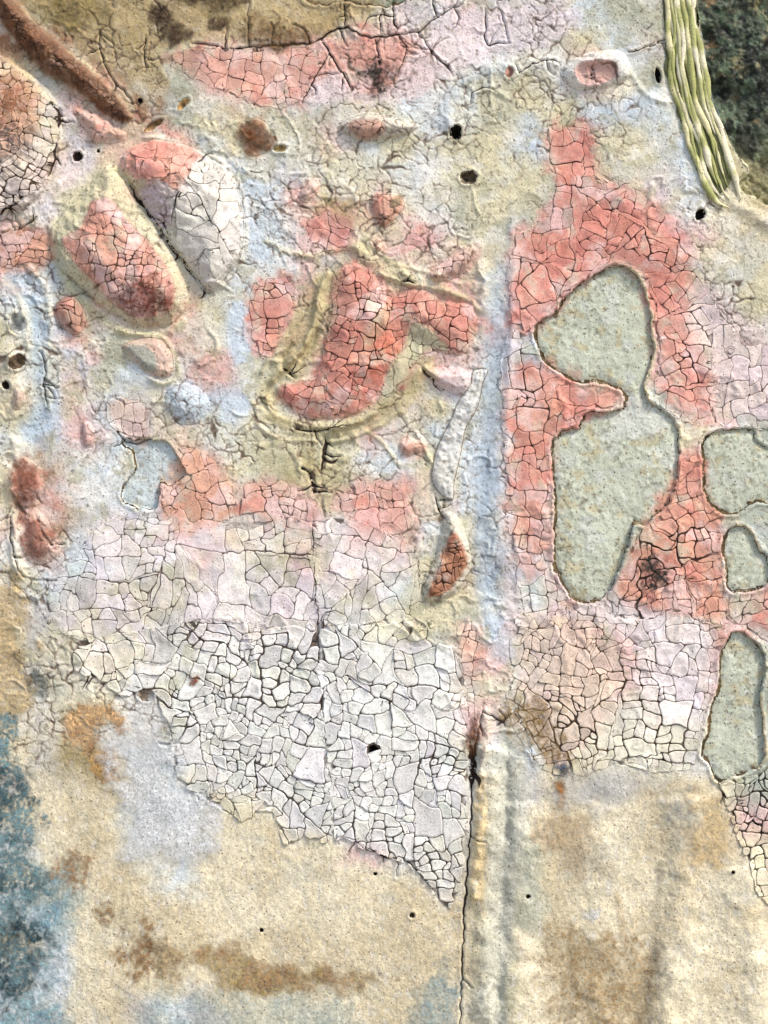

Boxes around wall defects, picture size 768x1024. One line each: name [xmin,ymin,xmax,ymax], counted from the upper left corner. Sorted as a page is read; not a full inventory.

corrosion [241,119,277,153]
crack [138,0,559,110]
crack [277,266,477,471]
peeling [533,265,680,603]
crack [482,121,768,781]
peeling [701,428,768,593]
leakage [0,571,64,1024]
corrosion [64,703,125,783]
crack [43,448,486,1024]
corrosion [465,720,485,754]
peeling [701,632,768,782]
leakage [195,947,371,996]